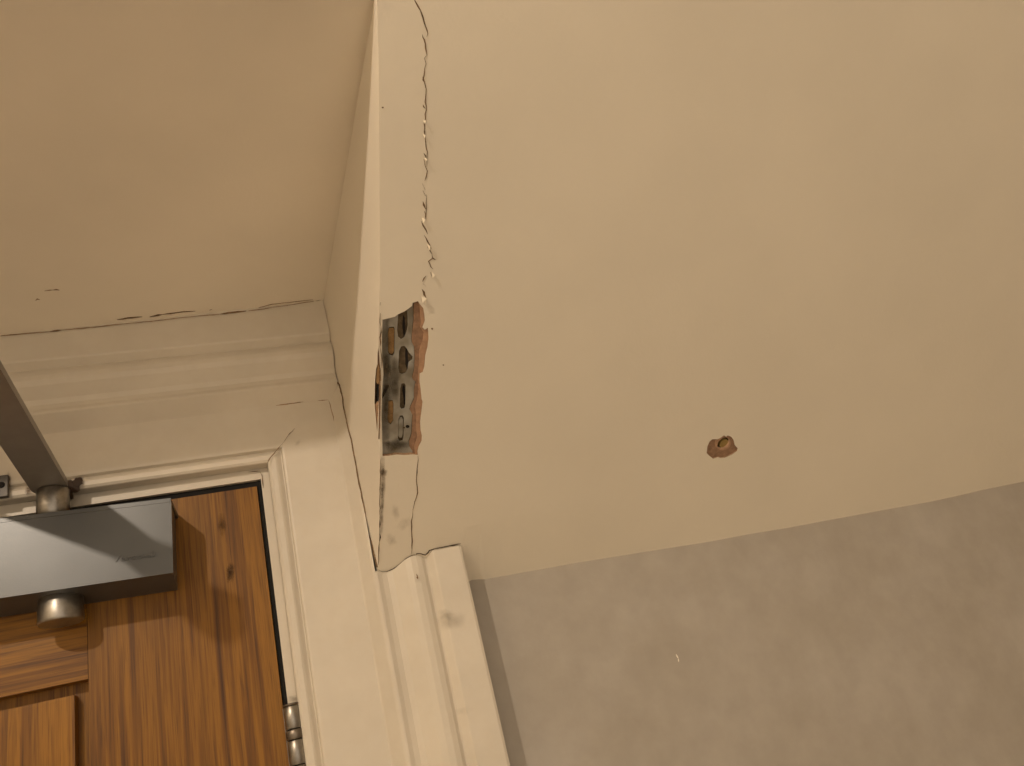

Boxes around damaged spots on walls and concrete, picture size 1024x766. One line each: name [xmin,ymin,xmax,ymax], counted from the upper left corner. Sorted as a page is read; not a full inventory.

crack [414,0,436,304]
crack [1,300,320,336]
crack [251,365,458,572]
spalling [375,301,428,456]
spalling [707,436,738,459]